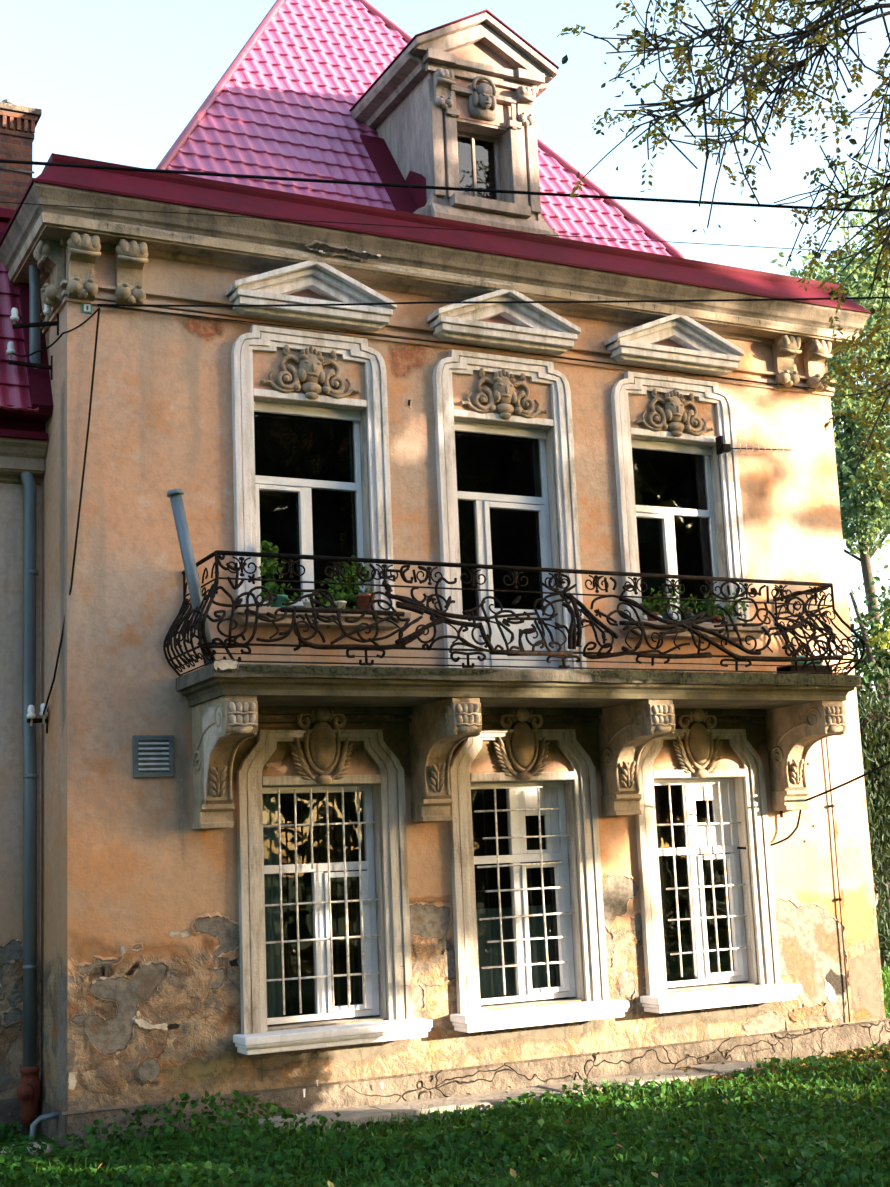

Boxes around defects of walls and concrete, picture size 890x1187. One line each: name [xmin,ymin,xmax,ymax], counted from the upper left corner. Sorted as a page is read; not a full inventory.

flaking render [0,938,23,1027]
flaking render [69,942,172,1062]
flaking render [189,911,240,994]
flaking render [412,983,426,1019]
flaking render [409,901,456,986]
flaking render [602,872,643,1011]
flaking render [742,896,849,1037]
peeling [66,1069,78,1091]